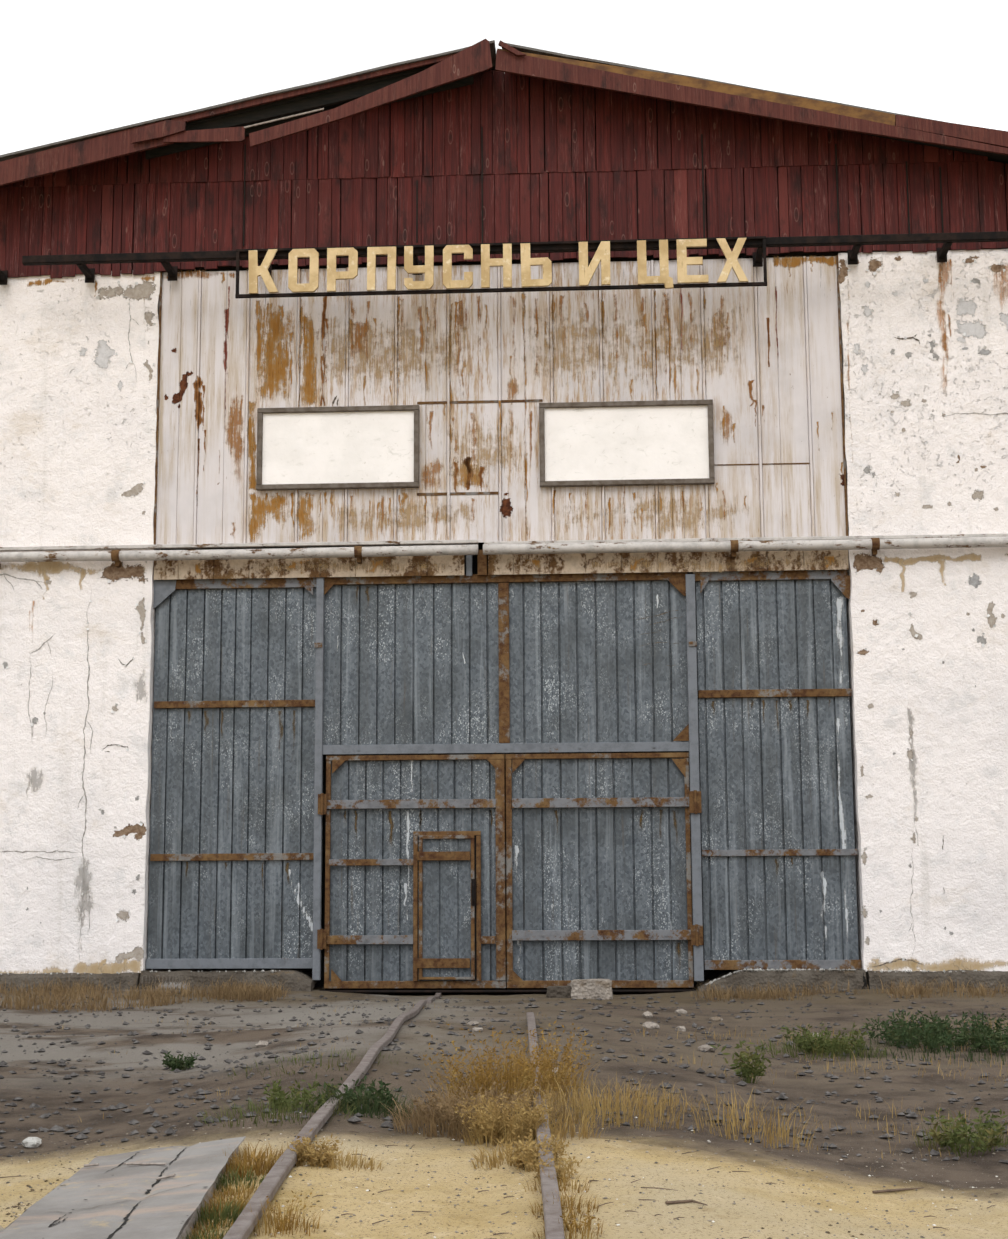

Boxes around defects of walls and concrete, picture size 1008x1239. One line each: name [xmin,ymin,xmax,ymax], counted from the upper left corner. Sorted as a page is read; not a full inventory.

rust [27,278,79,286]
spalling [837,256,902,288]
spalling [962,255,1005,285]
rust [766,286,778,367]
rust [937,259,952,371]
peeling [956,297,1008,356]
rust [142,270,746,542]
rust [748,380,765,427]
spalling [853,553,885,574]
spalling [101,561,148,644]
crack [2,590,129,960]
spalling [113,821,147,840]